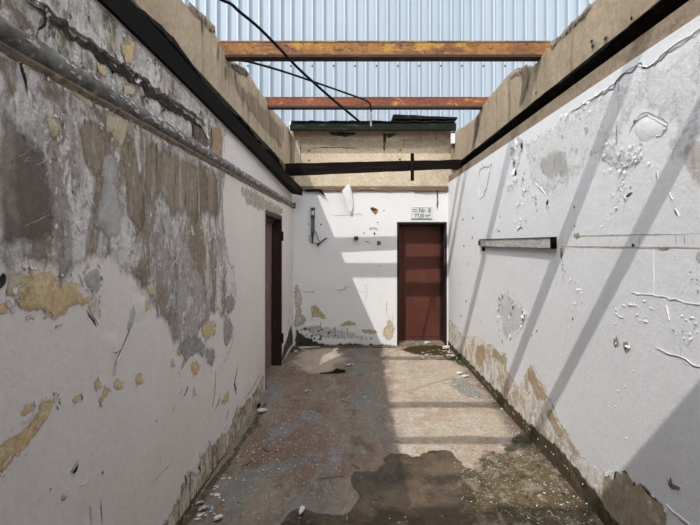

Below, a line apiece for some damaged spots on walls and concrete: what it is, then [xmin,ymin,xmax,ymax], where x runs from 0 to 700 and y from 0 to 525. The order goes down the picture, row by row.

crack [25,0,225,148]
spalling [0,0,271,374]
flaking render [507,42,700,230]
crack [560,29,700,143]
peeling [0,391,63,477]
leakage [176,403,267,525]
peeling [310,305,325,320]
leakage [440,341,619,525]
flaking render [449,292,668,525]
crack [657,347,700,368]